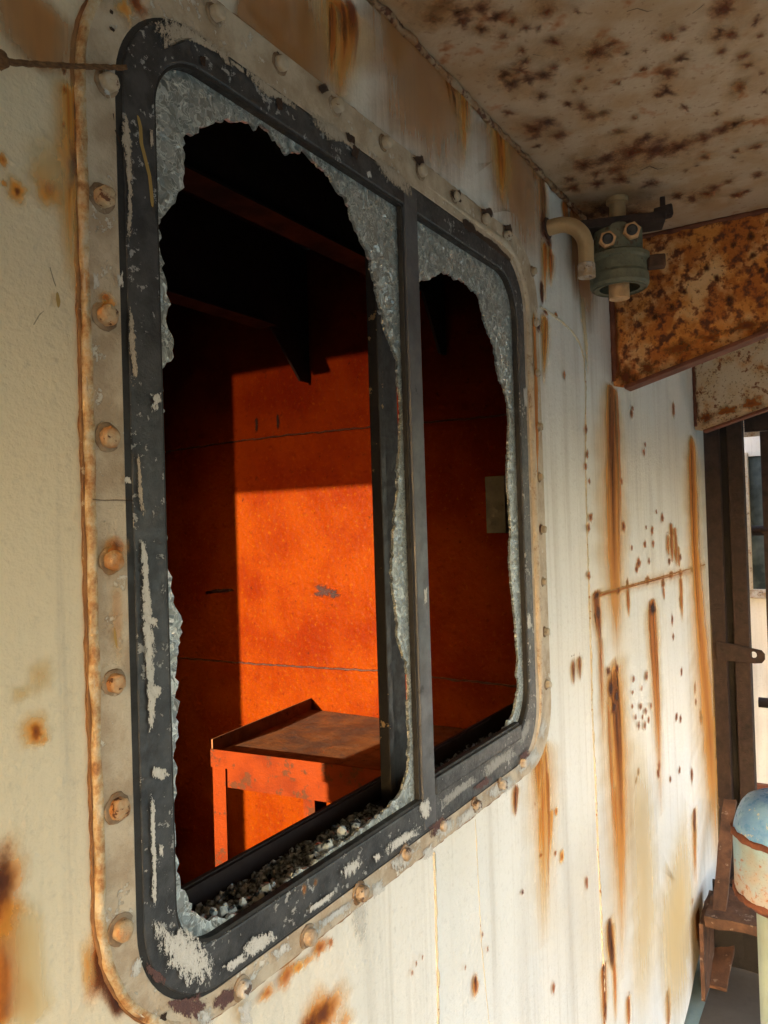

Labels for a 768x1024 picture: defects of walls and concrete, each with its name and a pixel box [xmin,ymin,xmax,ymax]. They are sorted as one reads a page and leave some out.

corrosion [329,0,358,83]
peeling [140,540,161,732]
corrosion [594,303,717,904]
corrosion [24,718,47,744]
peeling [152,766,170,780]
corrosion [535,745,564,875]
corrosion [0,854,41,1024]
peeling [131,794,292,1024]
corrosion [261,938,333,1001]
corrosion [305,991,349,1024]
peeling [303,891,356,938]
corrosion [602,919,630,1024]